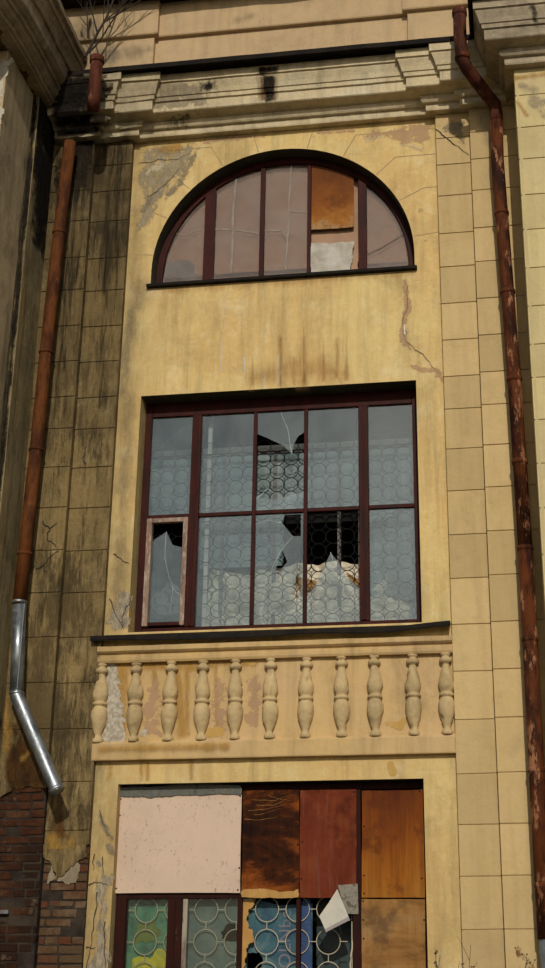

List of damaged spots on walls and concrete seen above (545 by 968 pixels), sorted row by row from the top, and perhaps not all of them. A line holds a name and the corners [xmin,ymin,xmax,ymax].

peeling [0,58,14,124]
peeling [138,134,267,230]
crack [36,522,58,570]
peeling [101,664,126,742]
flaking render [0,781,114,968]